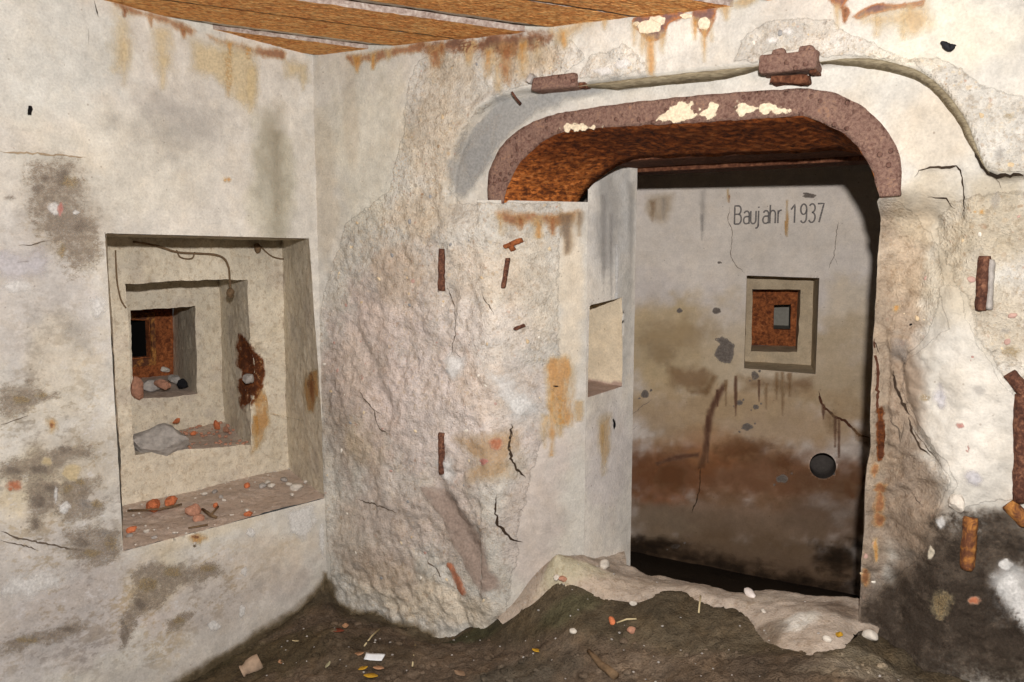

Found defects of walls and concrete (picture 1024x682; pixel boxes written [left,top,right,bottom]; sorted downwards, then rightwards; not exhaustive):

corrosion [347,23,582,84]
spalling [734,18,1024,173]
crack [917,153,1023,217]
spalling [320,38,647,638]
crack [873,339,940,463]
crack [508,424,524,477]
crack [494,495,523,542]
damp [630,537,861,594]
damp [860,509,1024,682]